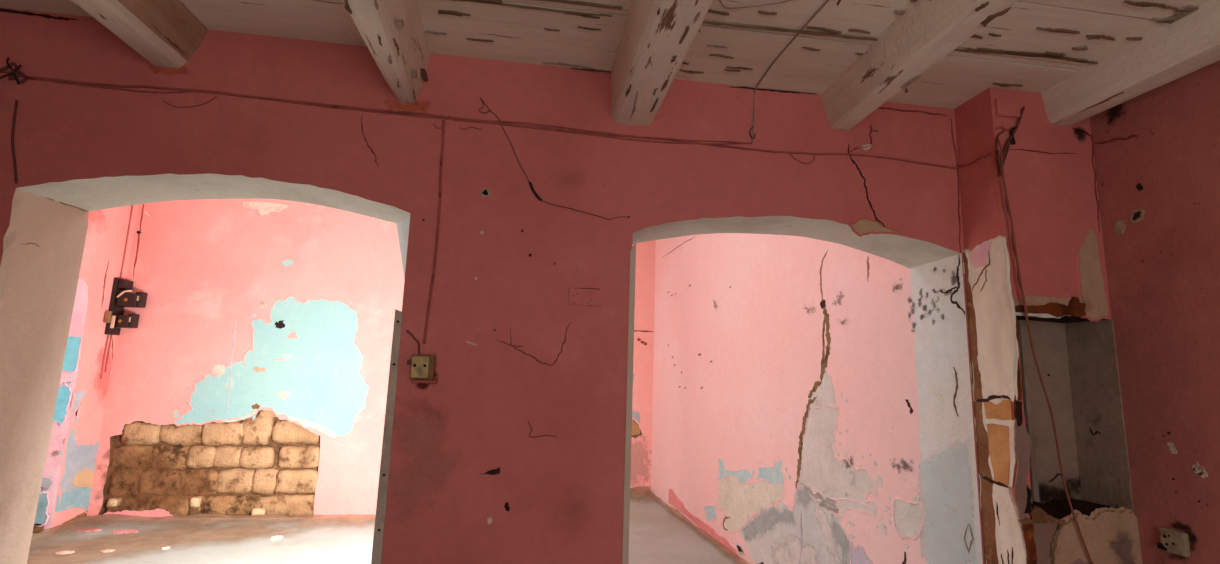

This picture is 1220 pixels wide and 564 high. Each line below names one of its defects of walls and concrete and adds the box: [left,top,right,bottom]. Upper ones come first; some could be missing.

flaking render [849,218,901,237]
crack [848,107,965,314]
peeling [33,335,100,533]
peeling [173,295,371,446]
crack [498,321,573,366]
peeling [668,369,927,564]
crack [795,250,831,489]
crack [952,367,960,417]
flaking render [962,226,1142,564]